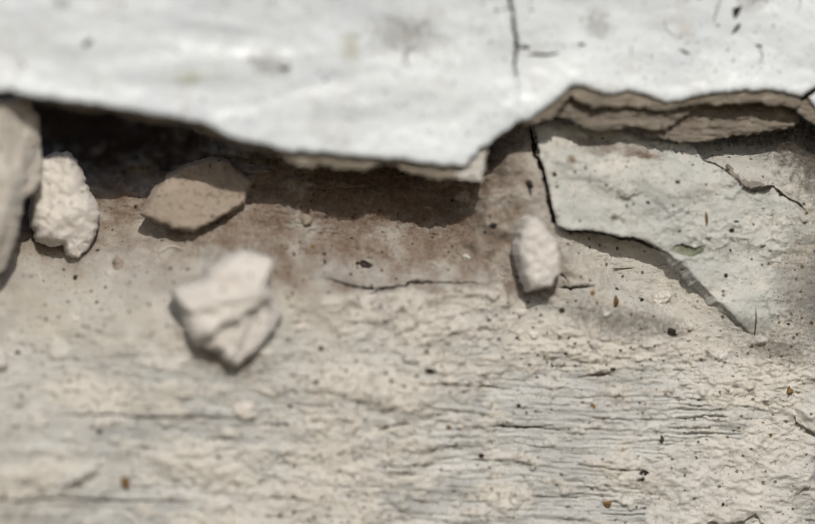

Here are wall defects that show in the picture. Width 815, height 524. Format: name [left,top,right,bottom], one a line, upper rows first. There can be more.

crack [508,0,559,80]
peeling [0,0,815,182]
flaking render [139,156,254,232]
crack [525,124,706,252]
crack [699,156,809,215]
crack [318,275,489,294]
crack [560,274,596,291]
peeling [673,245,706,257]